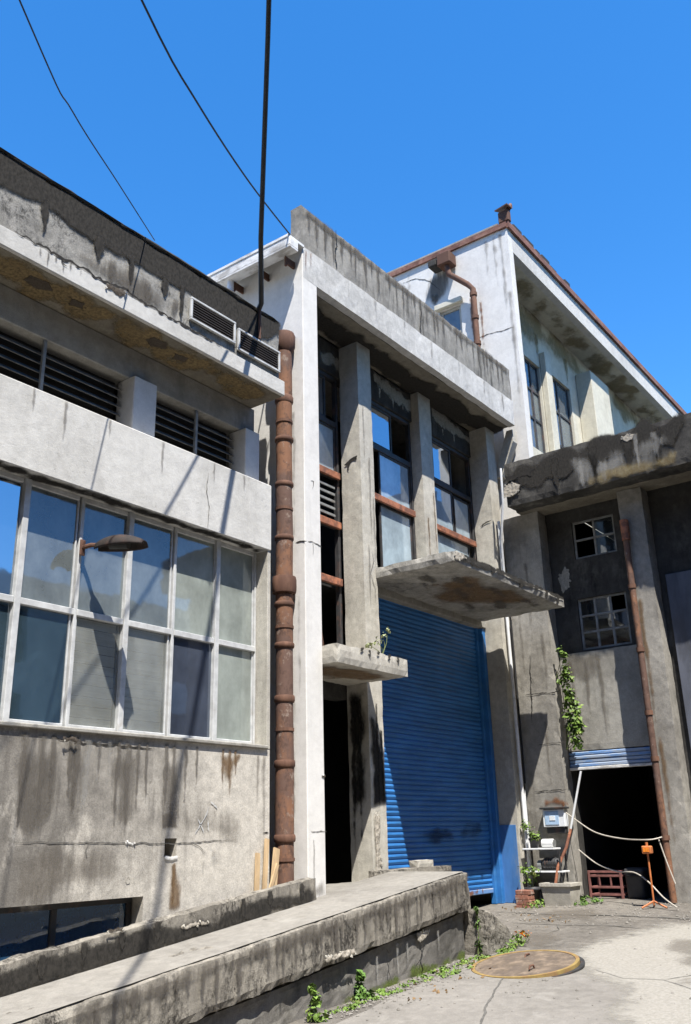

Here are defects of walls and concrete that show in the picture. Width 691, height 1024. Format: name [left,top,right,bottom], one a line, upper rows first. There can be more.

damp [0,152,281,339]
spalling [105,283,128,297]
damp [306,211,507,378]
damp [516,281,532,297]
damp [317,305,504,434]
damp [566,328,639,397]
spalling [503,482,520,498]
spalling [558,567,571,593]
corrosion [639,600,649,658]
damp [17,732,80,830]
damp [162,744,198,818]
corrosion [222,749,240,784]